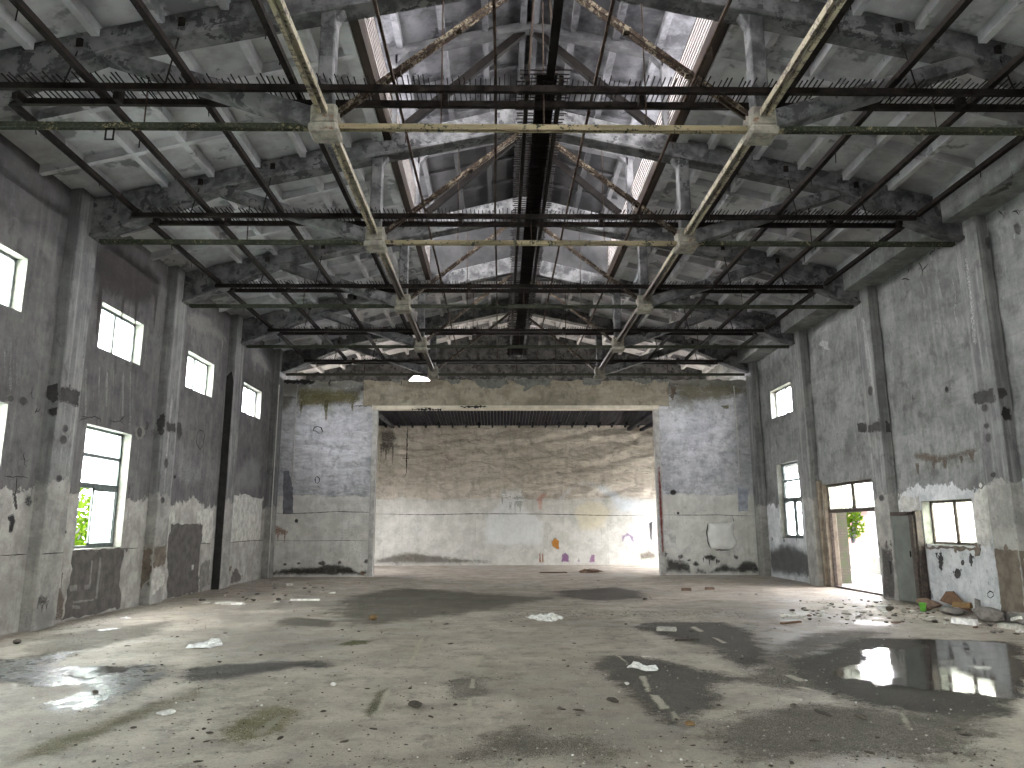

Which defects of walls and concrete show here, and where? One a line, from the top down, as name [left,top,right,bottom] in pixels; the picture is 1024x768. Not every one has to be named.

flaking render [46,383,81,445]
flaking render [62,547,128,620]
flaking render [140,496,213,598]
flaking render [924,471,1024,613]